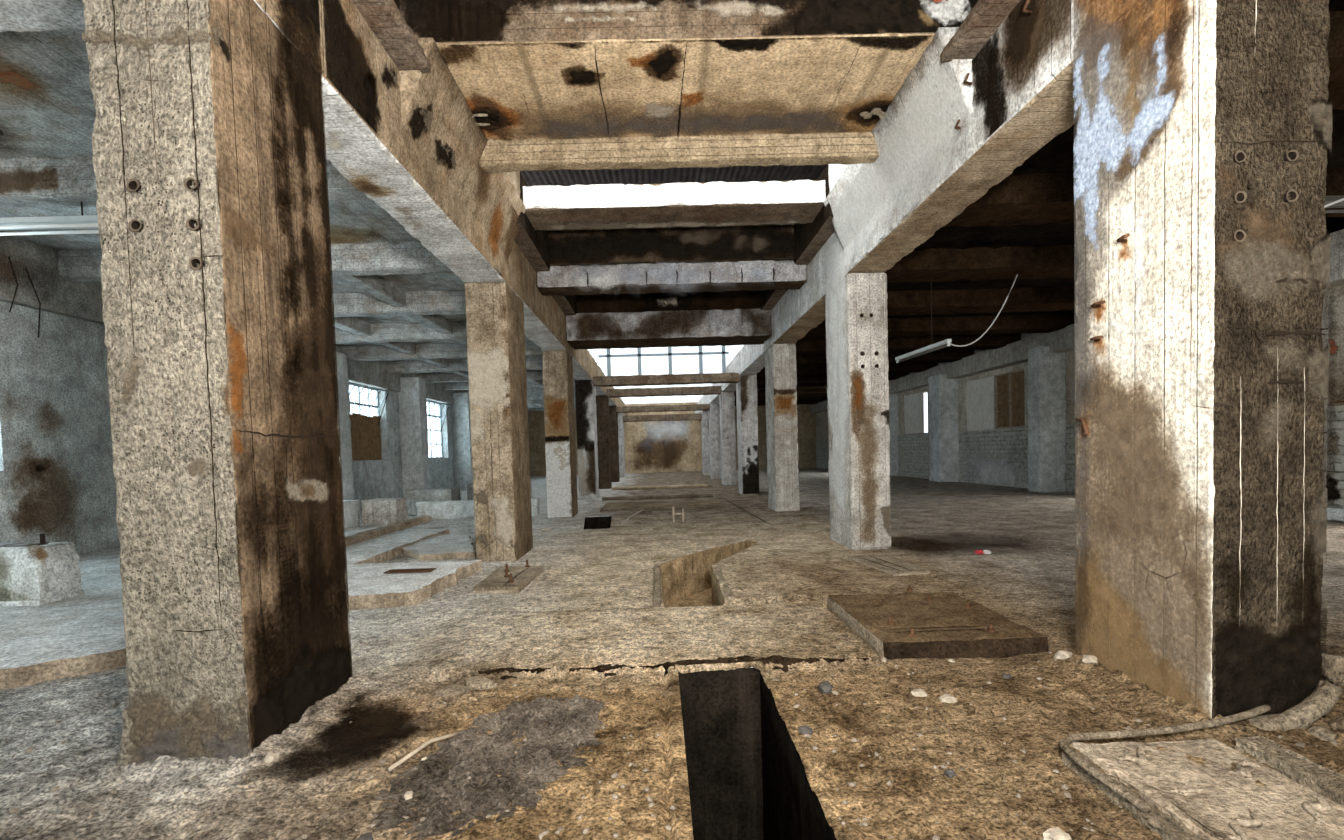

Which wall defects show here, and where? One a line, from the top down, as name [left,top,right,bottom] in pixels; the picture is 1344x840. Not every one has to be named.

damp [402,0,662,63]
peeling [675,38,803,51]
damp [682,0,969,36]
peeling [838,0,968,49]
rust [1169,15,1186,56]
damp [1075,370,1327,717]